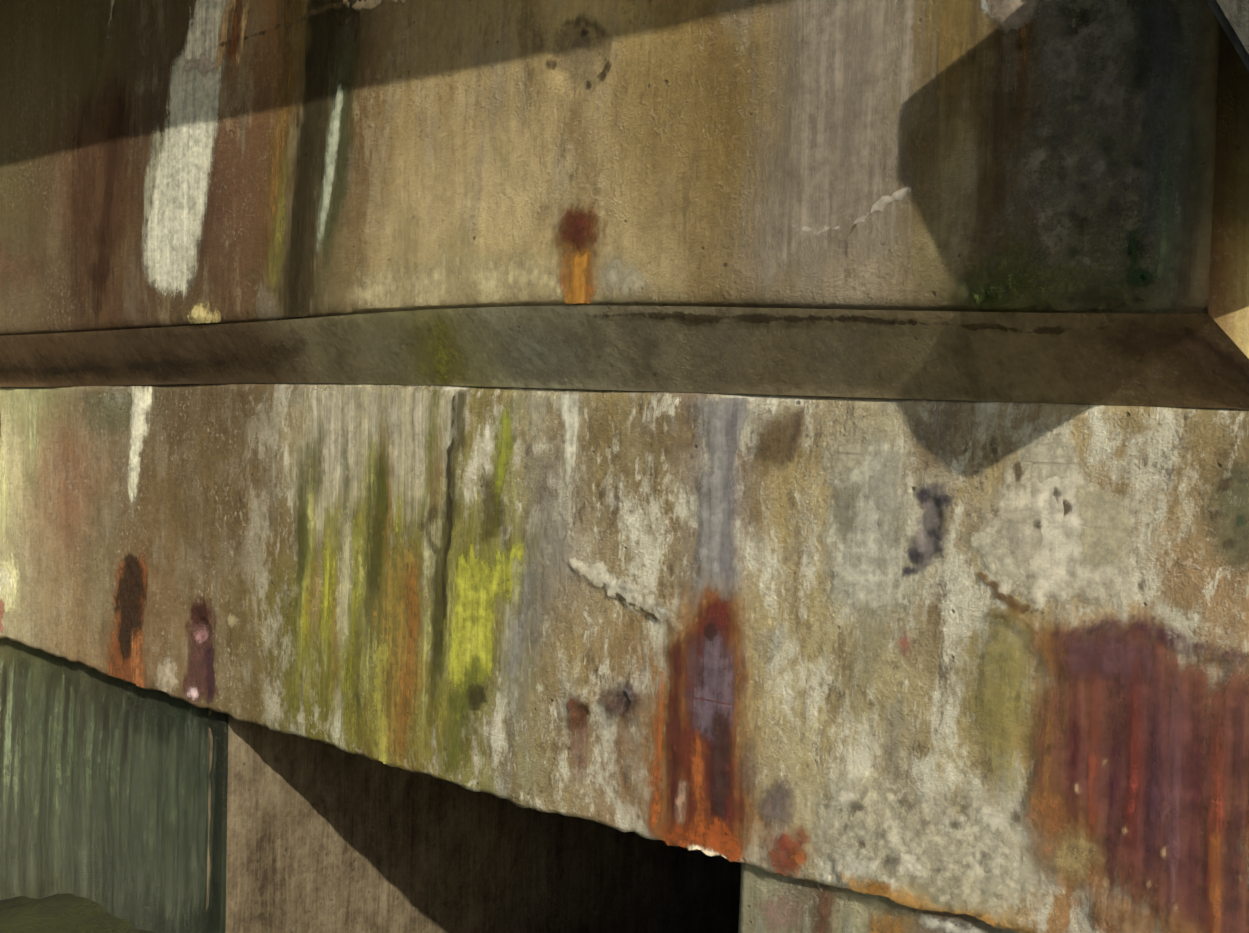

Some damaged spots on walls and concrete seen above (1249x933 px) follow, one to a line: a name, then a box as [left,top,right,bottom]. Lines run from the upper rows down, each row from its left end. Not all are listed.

crack [219,0,406,47]
leakage [981,0,1042,102]
leakage [142,0,250,323]
leakage [266,0,355,317]
corrosion [558,210,597,304]
crack [792,186,915,258]
leakage [292,384,467,652]
leakage [482,476,504,537]
corrosion [109,554,147,688]
corrosion [183,599,217,703]
corrosion [566,588,809,876]
corrosion [1027,617,1249,933]